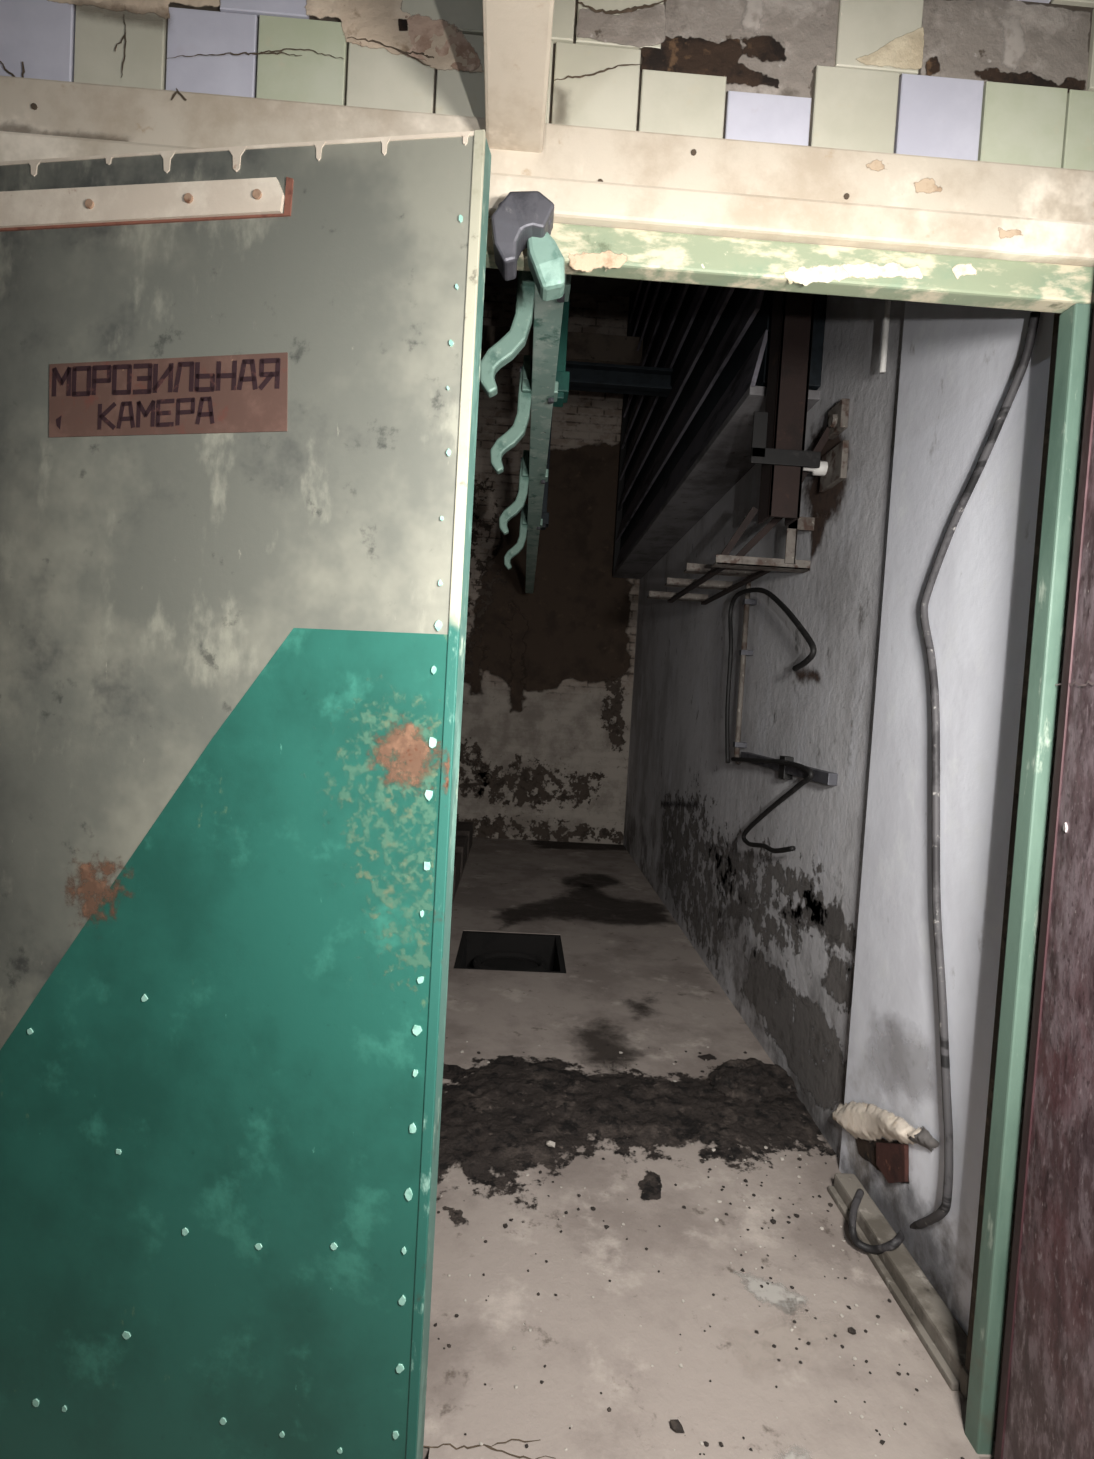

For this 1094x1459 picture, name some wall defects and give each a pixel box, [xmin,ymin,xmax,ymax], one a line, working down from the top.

spalling [48,0,220,19]
spalling [305,0,484,73]
spalling [576,0,839,98]
spalling [857,0,1091,94]
peeling [568,250,627,272]
peeling [784,262,923,286]
peeling [952,264,977,280]
flaking render [464,476,509,682]
flaking render [600,676,628,752]
flaking render [456,737,624,844]